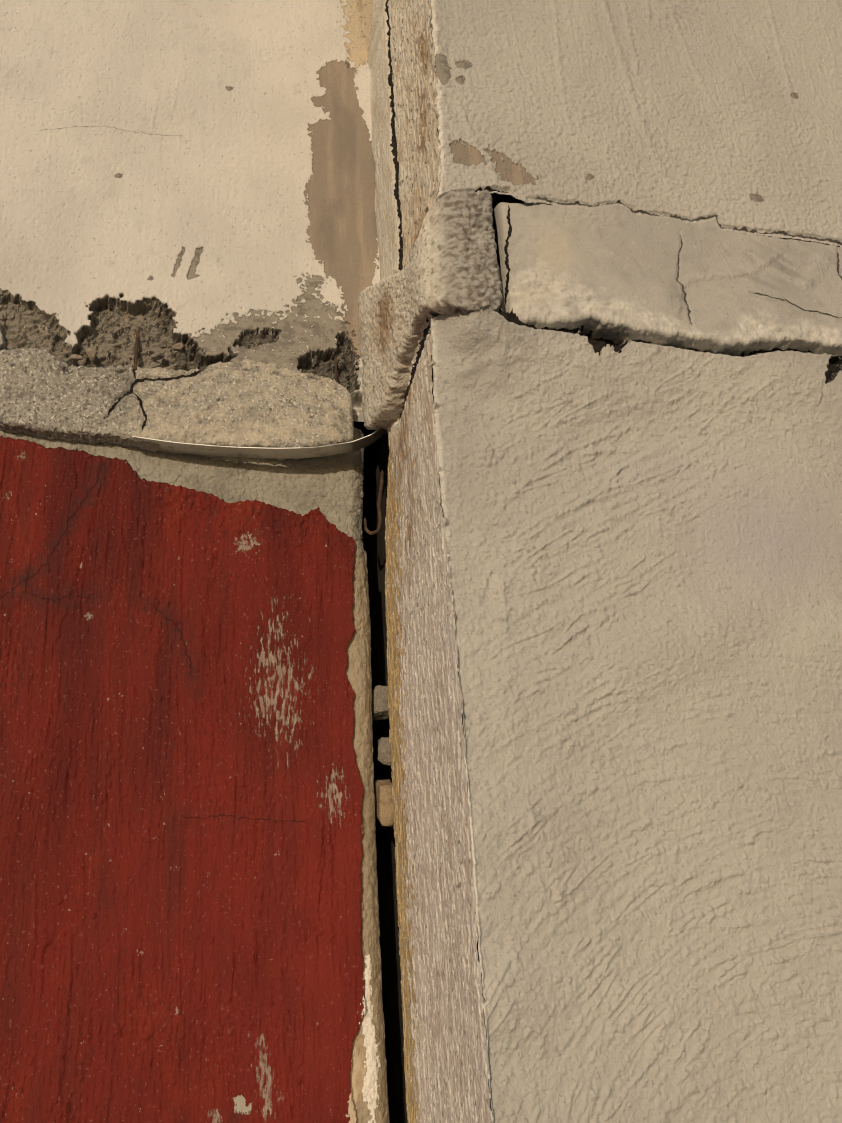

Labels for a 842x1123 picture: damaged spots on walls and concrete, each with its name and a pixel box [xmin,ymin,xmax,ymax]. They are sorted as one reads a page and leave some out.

peeling [0,0,379,394]
crack [385,0,403,270]
crack [474,186,659,346]
crack [536,197,842,358]
crack [107,369,204,430]
peeling [0,427,365,559]
peeling [249,598,312,766]
peeling [208,1035,275,1123]